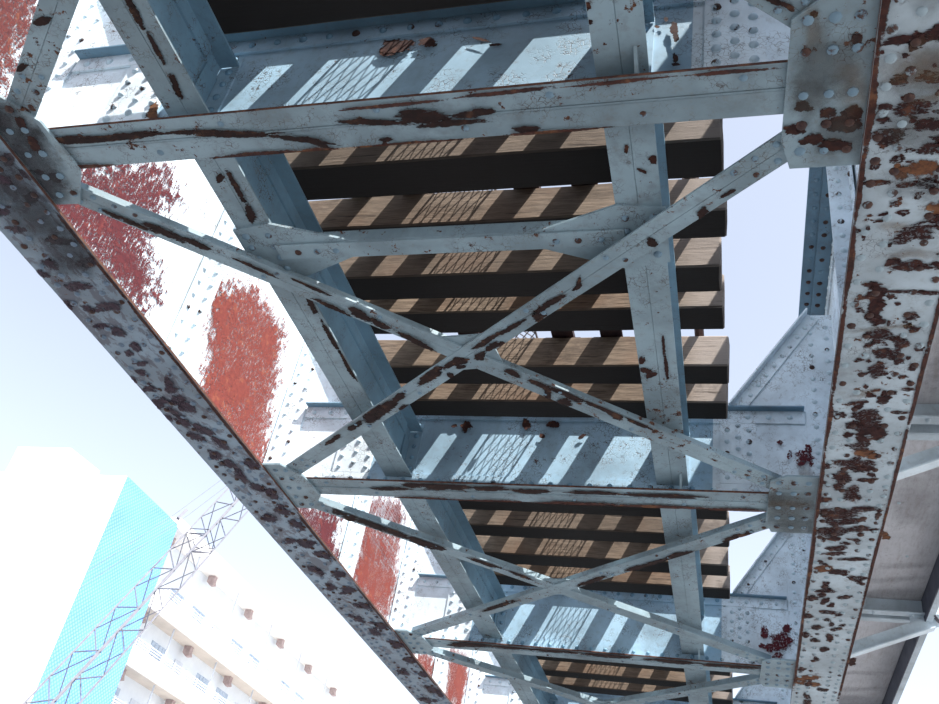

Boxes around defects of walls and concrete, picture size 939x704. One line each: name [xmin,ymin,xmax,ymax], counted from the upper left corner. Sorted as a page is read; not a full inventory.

corrosion [339,67,779,111]
corrosion [211,147,339,159]
corrosion [354,139,467,148]
corrosion [503,126,613,136]
corrosion [55,212,259,465]
corrosion [759,0,891,691]
corrosion [837,299,939,701]
corrosion [293,508,336,561]
corrosion [353,583,438,688]